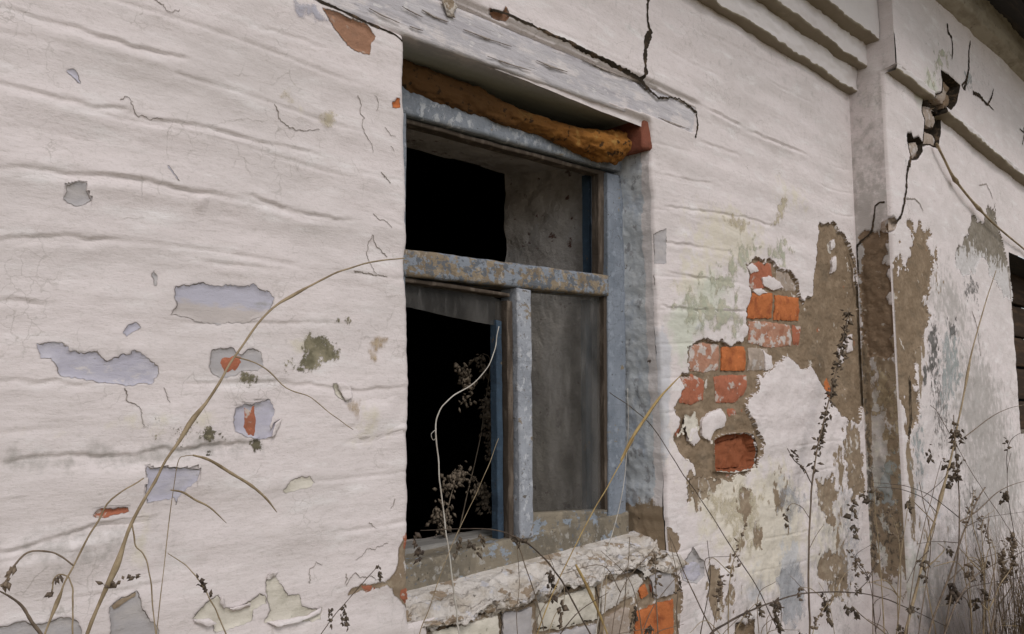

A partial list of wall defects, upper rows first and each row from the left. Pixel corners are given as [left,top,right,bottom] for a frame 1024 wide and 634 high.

flaking render [322,7,376,55]
crack [317,0,699,138]
crack [947,23,994,110]
crack [850,156,923,293]
flaking render [955,205,1013,302]
peeling [170,282,274,325]
peeling [37,342,159,386]
mould [285,332,341,373]
flaking render [674,217,938,550]
peeling [109,591,159,634]
peeling [192,571,322,632]
spalling [426,527,755,634]